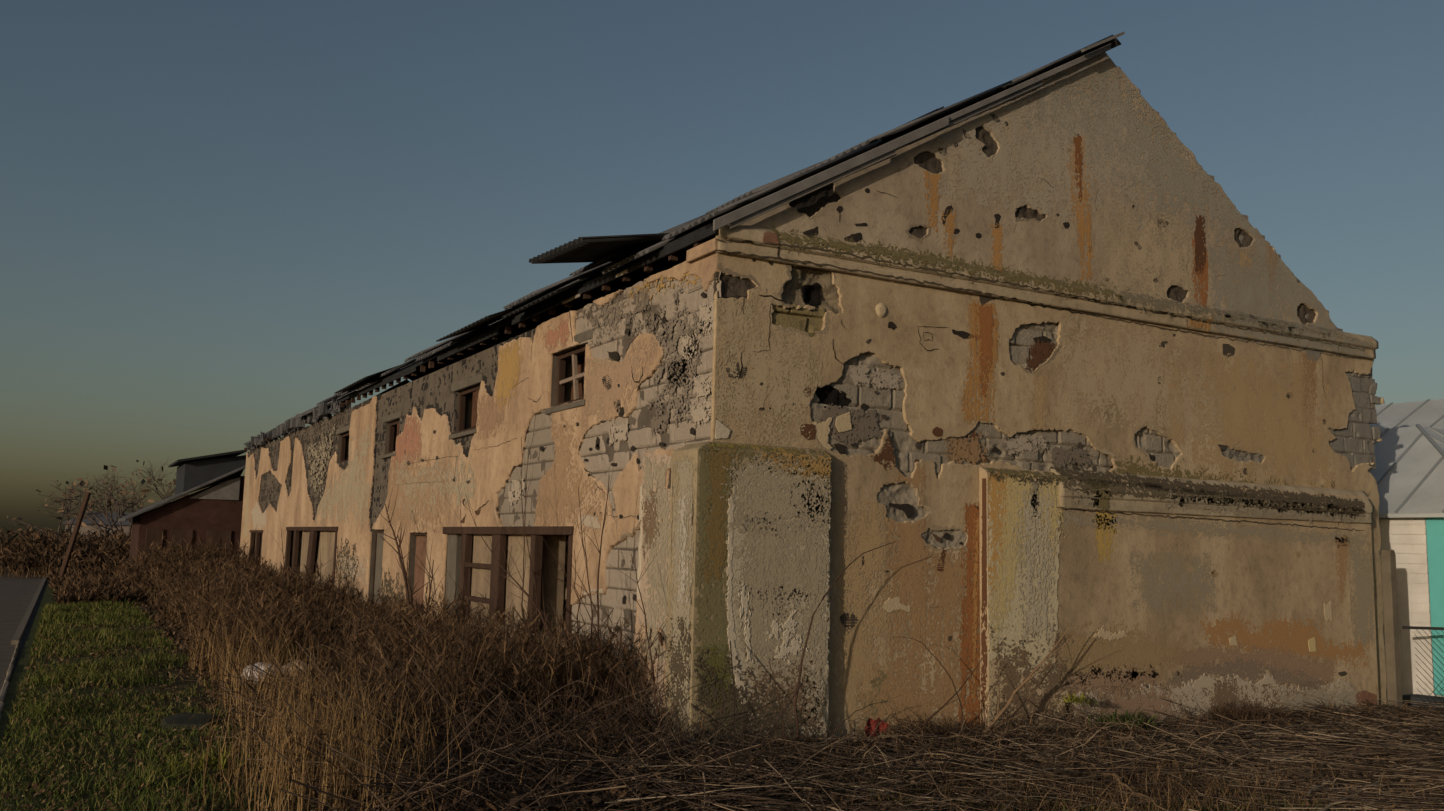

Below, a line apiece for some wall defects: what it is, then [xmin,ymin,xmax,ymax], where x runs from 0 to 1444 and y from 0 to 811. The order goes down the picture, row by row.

spalling [247,329,536,541]
spalling [453,259,842,717]
water stain [508,271,901,758]
spalling [789,183,843,237]
corrosion [871,436,896,471]
corrosion [924,170,957,257]
corrosion [879,299,1065,732]
spalling [1000,323,1061,376]
corrosion [1068,135,1096,282]
spalling [793,339,1381,734]
water stain [937,53,1376,733]
corrosion [1187,215,1213,333]